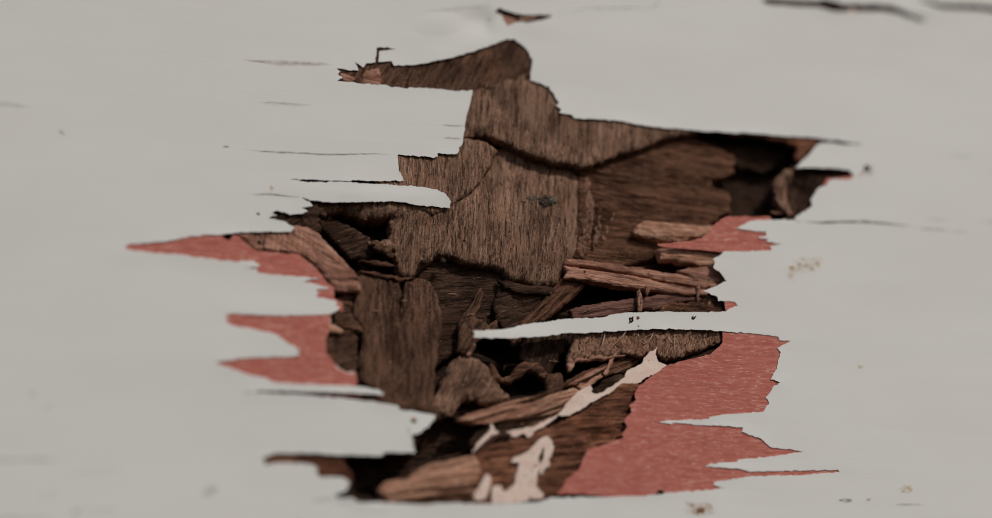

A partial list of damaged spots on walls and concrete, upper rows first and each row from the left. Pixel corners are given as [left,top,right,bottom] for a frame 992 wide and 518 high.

peeling [657,216,778,253]
peeling [125,235,361,400]
peeling [557,331,839,497]